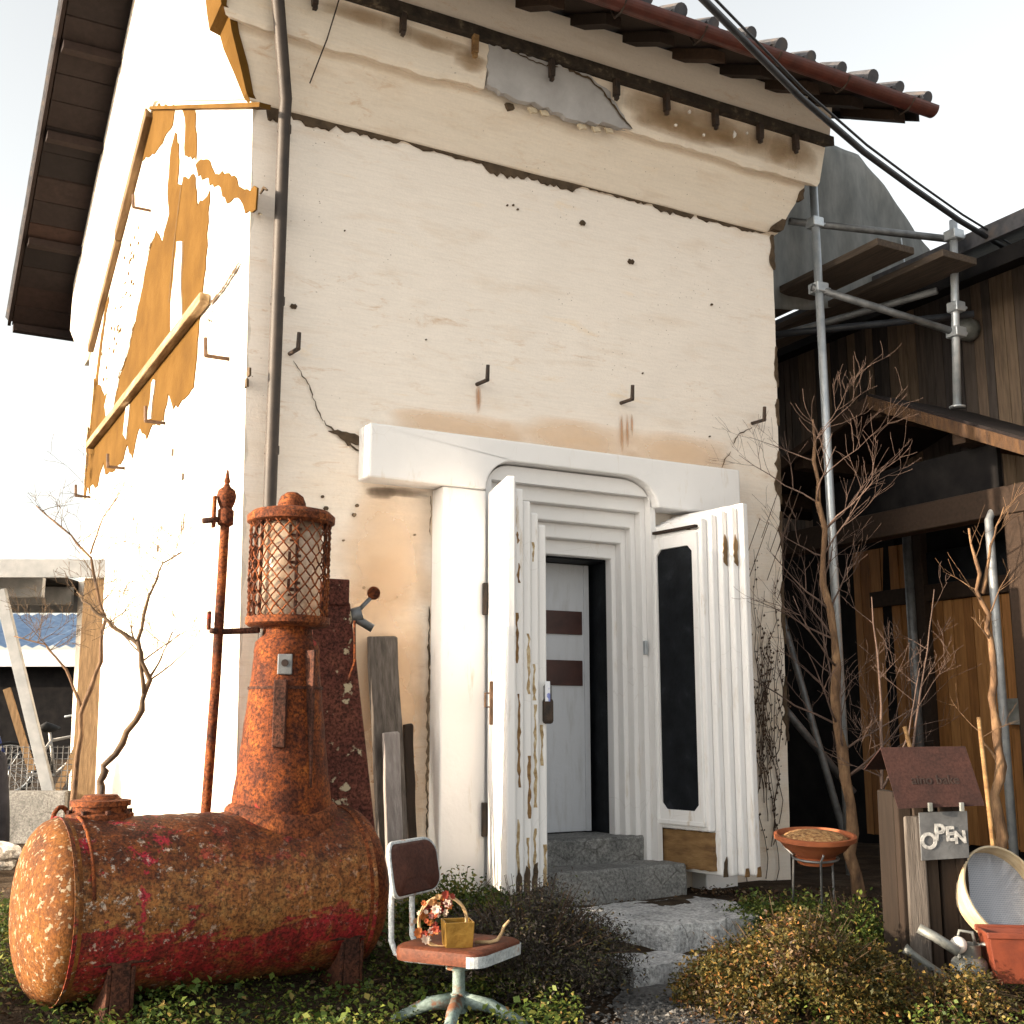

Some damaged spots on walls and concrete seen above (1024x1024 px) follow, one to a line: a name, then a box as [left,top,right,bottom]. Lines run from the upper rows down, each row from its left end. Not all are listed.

flaking render [485,44,632,134]
flaking render [266,107,787,270]
flaking render [84,103,268,501]
crack [294,362,359,451]
rust [621,417,633,446]
flaking render [774,451,784,550]
flaking render [516,613,547,892]